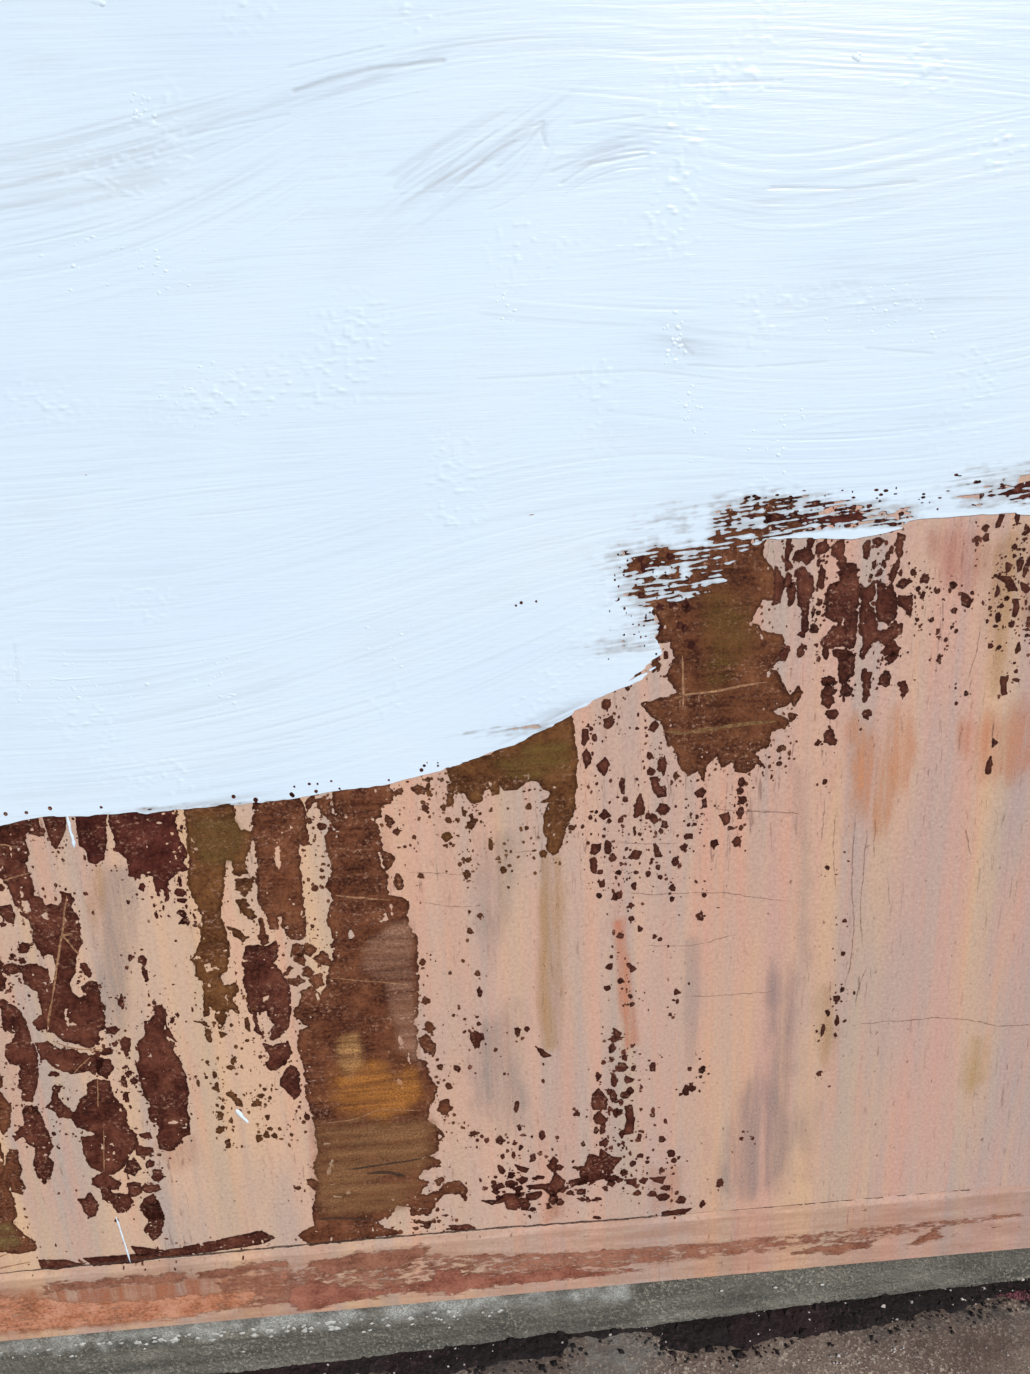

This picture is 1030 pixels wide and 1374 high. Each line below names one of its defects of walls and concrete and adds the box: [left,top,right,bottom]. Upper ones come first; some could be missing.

rust [0,474,1030,1333]